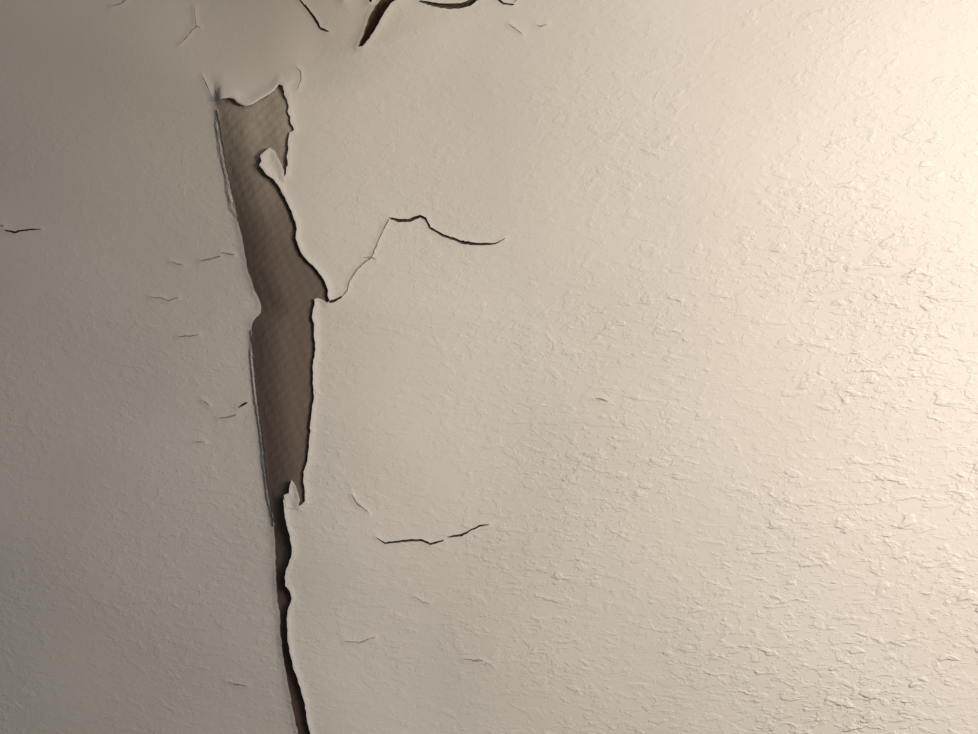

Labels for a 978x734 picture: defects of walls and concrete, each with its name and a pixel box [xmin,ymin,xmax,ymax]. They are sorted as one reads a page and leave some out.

crack [358,0,395,47]
crack [419,0,547,34]
crack [0,225,40,233]
crack [329,215,505,303]
peeling [213,72,330,734]
crack [375,524,489,545]